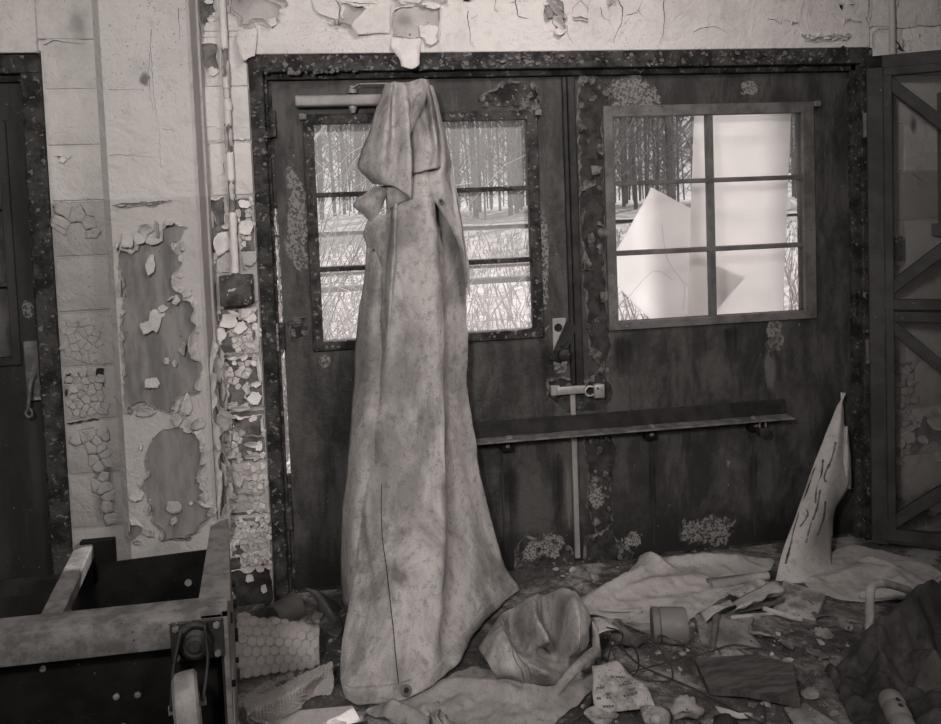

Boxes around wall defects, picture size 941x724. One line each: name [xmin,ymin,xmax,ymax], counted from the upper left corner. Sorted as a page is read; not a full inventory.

crack [467,0,529,48]
peeling [543,0,589,35]
crack [572,0,728,46]
peeling [199,0,581,174]
corrosion [478,79,542,110]
peeling [112,199,173,209]
peeling [210,182,257,275]
corrosion [546,75,629,413]
peeling [115,218,274,607]